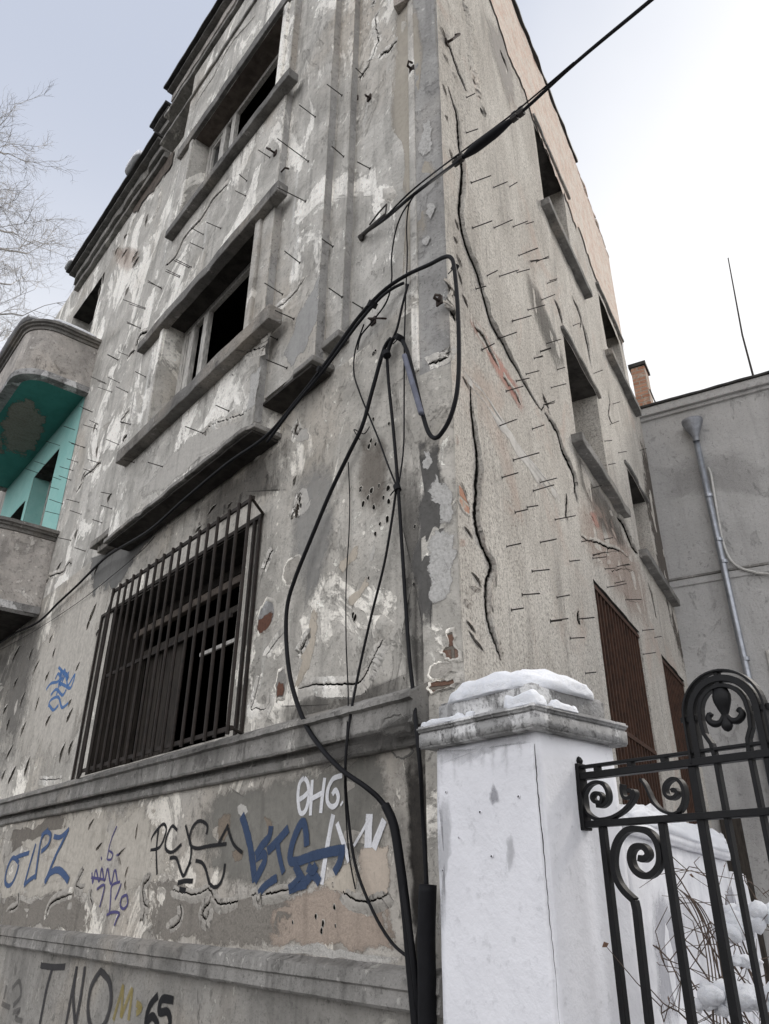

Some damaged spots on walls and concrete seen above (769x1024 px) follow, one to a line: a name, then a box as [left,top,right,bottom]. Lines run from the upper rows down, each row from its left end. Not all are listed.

crack [358,0,398,81]
crack [424,1,657,617]
peeling [422,451,473,603]
crack [470,386,505,660]
rust [257,612,273,633]
crack [247,626,389,720]
spalling [426,571,483,695]
crack [6,892,20,913]
crack [44,865,94,920]
peeling [0,754,397,963]
crack [339,885,394,917]